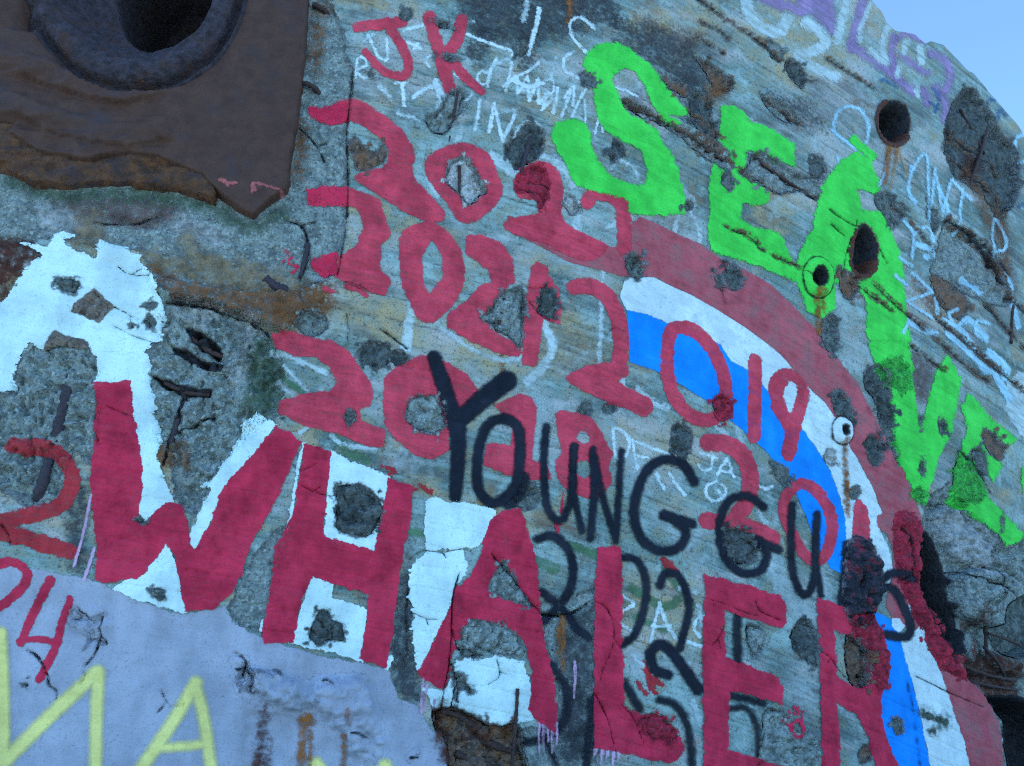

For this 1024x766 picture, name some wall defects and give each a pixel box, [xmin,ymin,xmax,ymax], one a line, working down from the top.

corrosion [0,122,218,254]
corrosion [883,145,899,186]
spalling [941,83,1024,220]
spalling [0,0,387,517]
corrosion [147,235,338,331]
spalling [478,281,565,352]
corrosion [814,285,828,335]
spalling [323,482,385,539]
spalling [289,605,348,648]
spalling [421,560,601,766]
spalling [841,426,1024,766]
crack [928,566,1014,664]